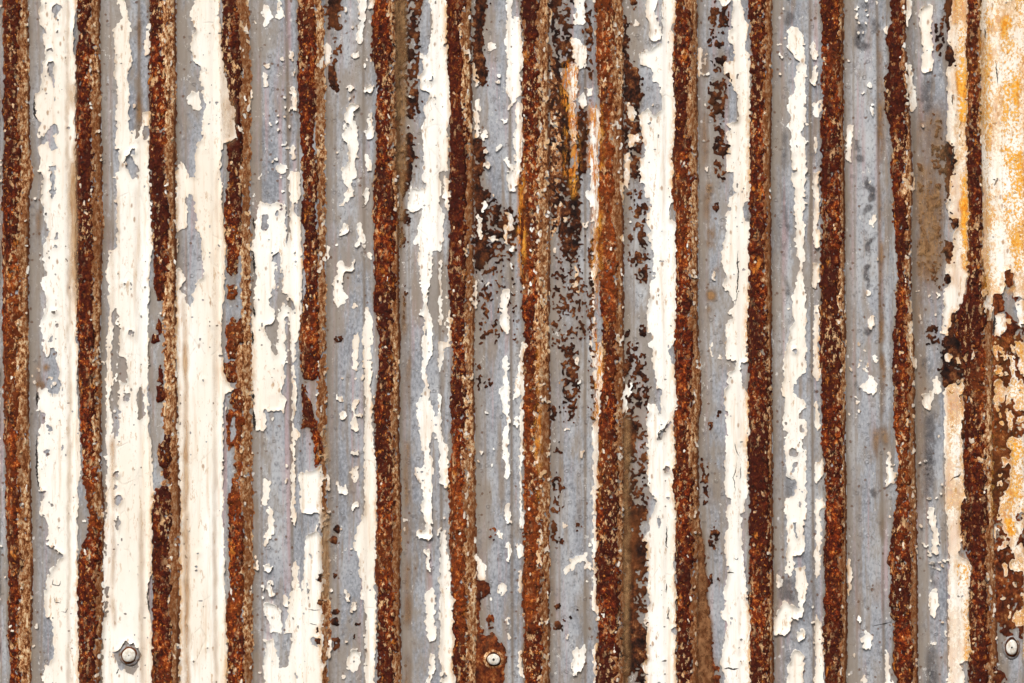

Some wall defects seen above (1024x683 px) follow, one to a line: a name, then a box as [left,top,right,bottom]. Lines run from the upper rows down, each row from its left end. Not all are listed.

corrosion [69,0,105,683]
corrosion [147,0,182,683]
peeling [0,0,387,683]
peeling [393,0,705,683]
corrosion [446,0,652,683]
corrosion [671,0,732,683]
corrosion [746,0,775,683]
peeling [709,0,826,683]
peeling [839,123,854,163]
peeling [839,340,879,418]
corrosion [883,0,1024,683]
peeling [885,0,1024,683]